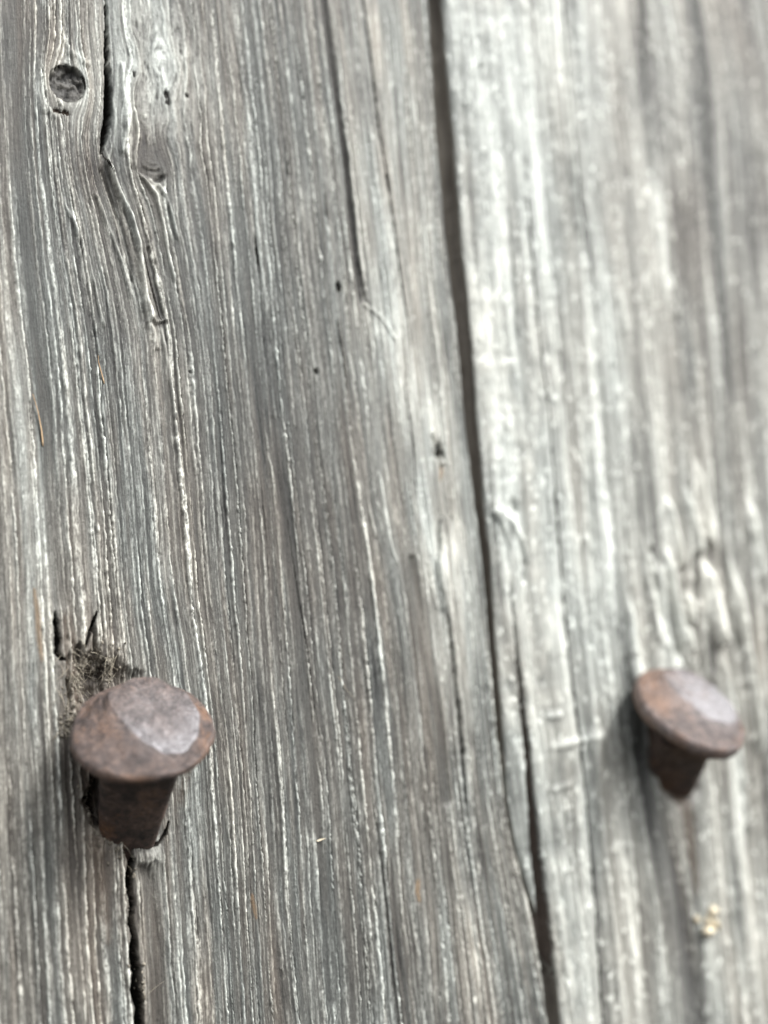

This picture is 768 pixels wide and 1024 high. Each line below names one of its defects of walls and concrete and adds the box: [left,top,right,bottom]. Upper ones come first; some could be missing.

crack [54,0,115,172]
crack [144,255,162,324]
crack [125,822,169,1024]